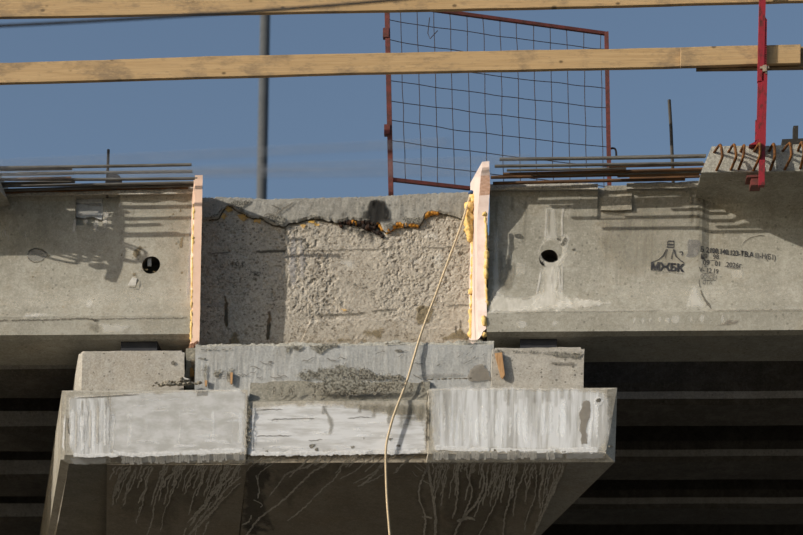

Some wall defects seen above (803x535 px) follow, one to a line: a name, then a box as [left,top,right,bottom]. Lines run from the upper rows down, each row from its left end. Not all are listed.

crack [256,247,285,255]
crack [209,206,358,229]
damp [367,200,389,220]
crack [309,213,462,251]
damp [491,209,603,312]
damp [55,364,607,535]